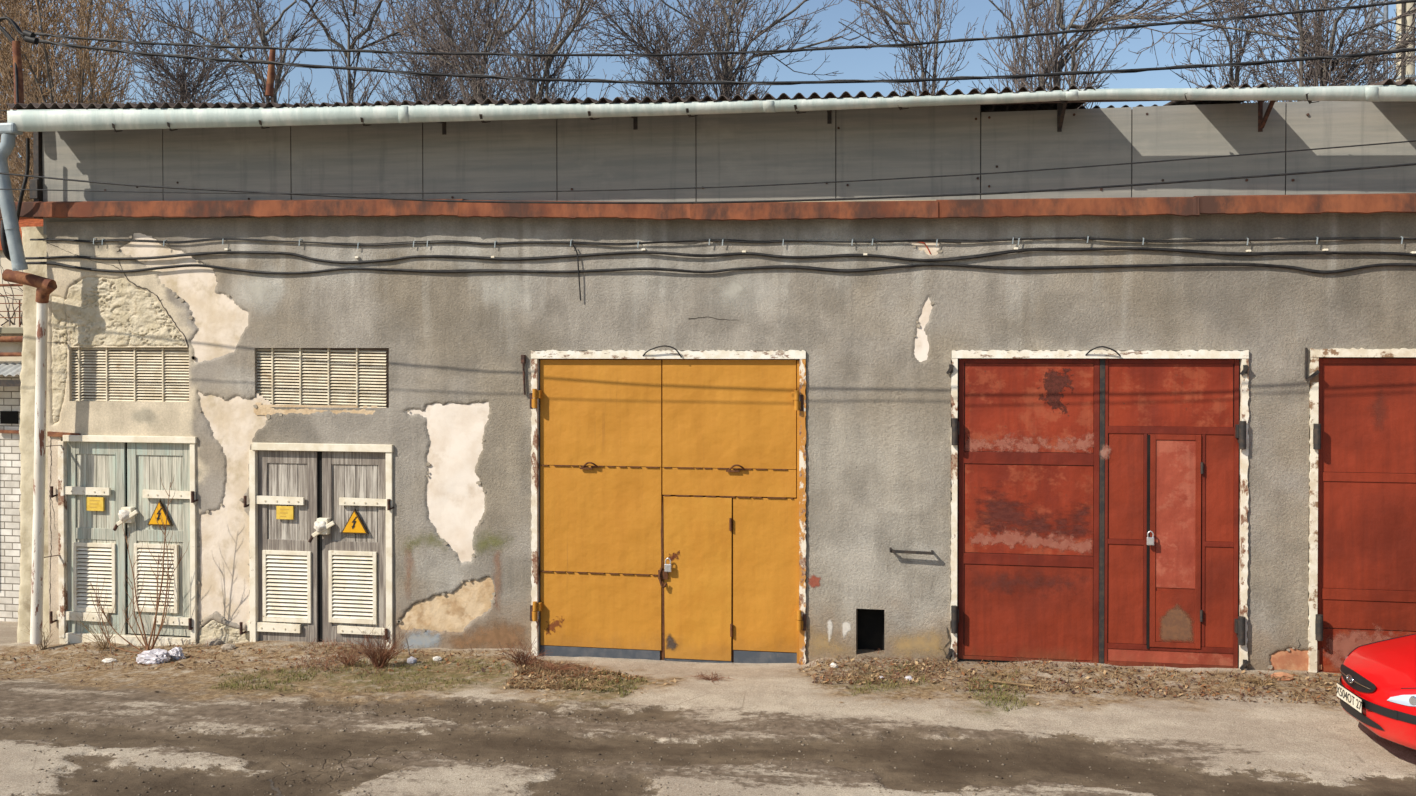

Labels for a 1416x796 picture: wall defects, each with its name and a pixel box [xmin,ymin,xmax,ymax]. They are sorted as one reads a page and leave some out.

spalling [51,233,249,423]
flaking render [914,297,935,362]
corrosion [1037,368,1074,414]
flaking render [404,402,489,563]
corrosion [976,499,1089,542]
flaking render [397,577,496,632]
corrosion [1160,606,1192,641]